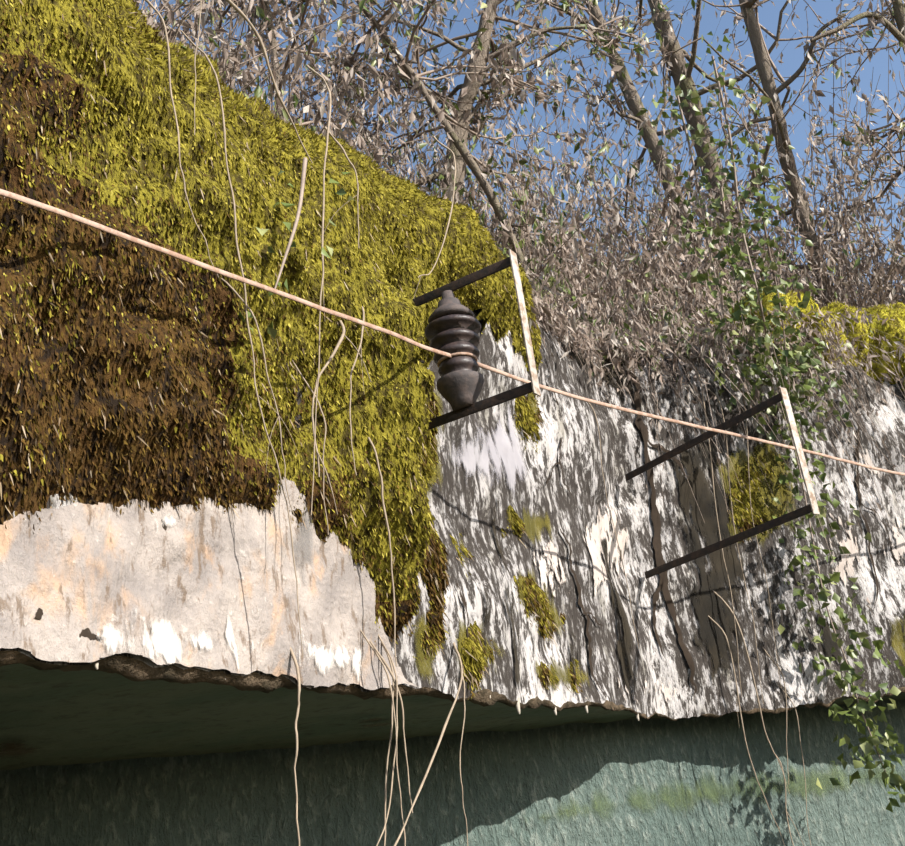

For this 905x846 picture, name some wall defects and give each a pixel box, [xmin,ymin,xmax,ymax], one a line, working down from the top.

spalling [0,477,417,690]
peeling [532,541,570,597]
peeling [583,506,629,595]
peeling [829,513,860,585]
peeling [883,515,905,575]
peeling [643,675,677,703]